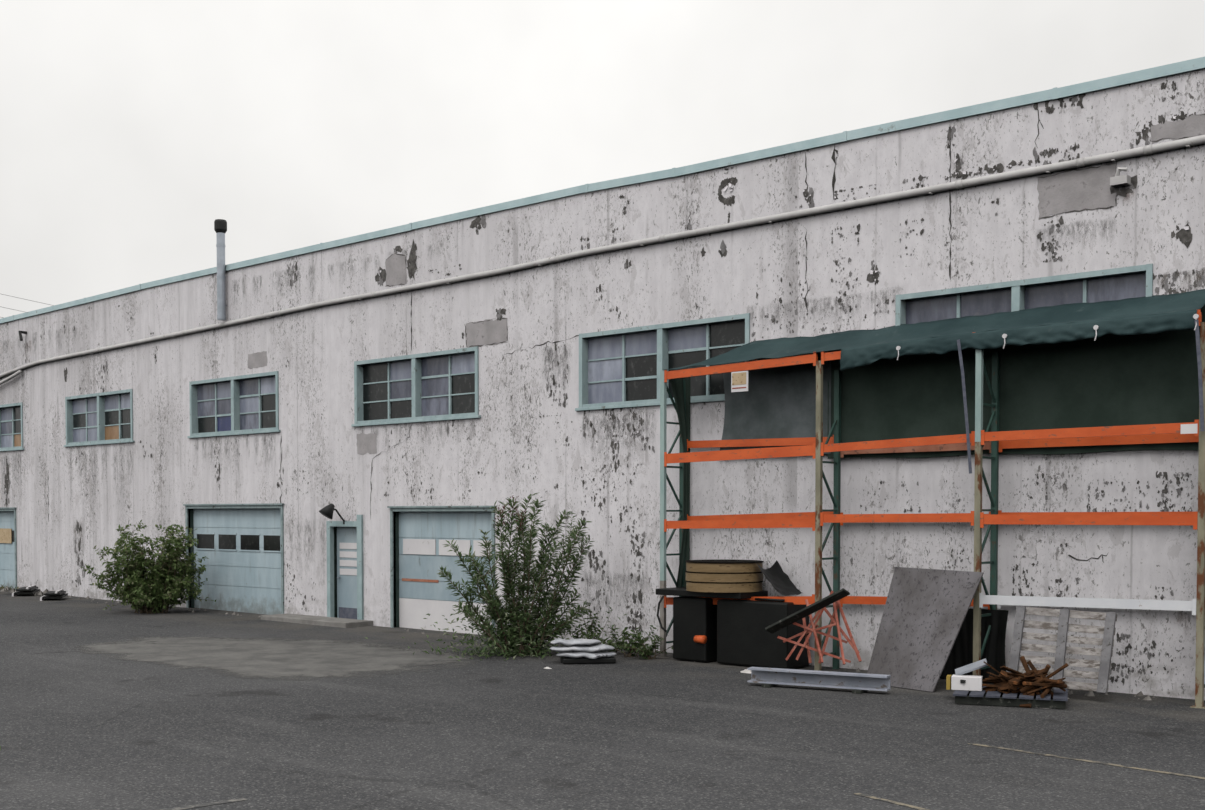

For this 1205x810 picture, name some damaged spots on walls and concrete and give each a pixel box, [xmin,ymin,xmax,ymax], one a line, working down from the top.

peeling [945,126,1137,262]
spalling [1171,223,1193,249]
peeling [375,239,462,286]
crack [465,318,579,355]
peeling [1087,471,1193,512]